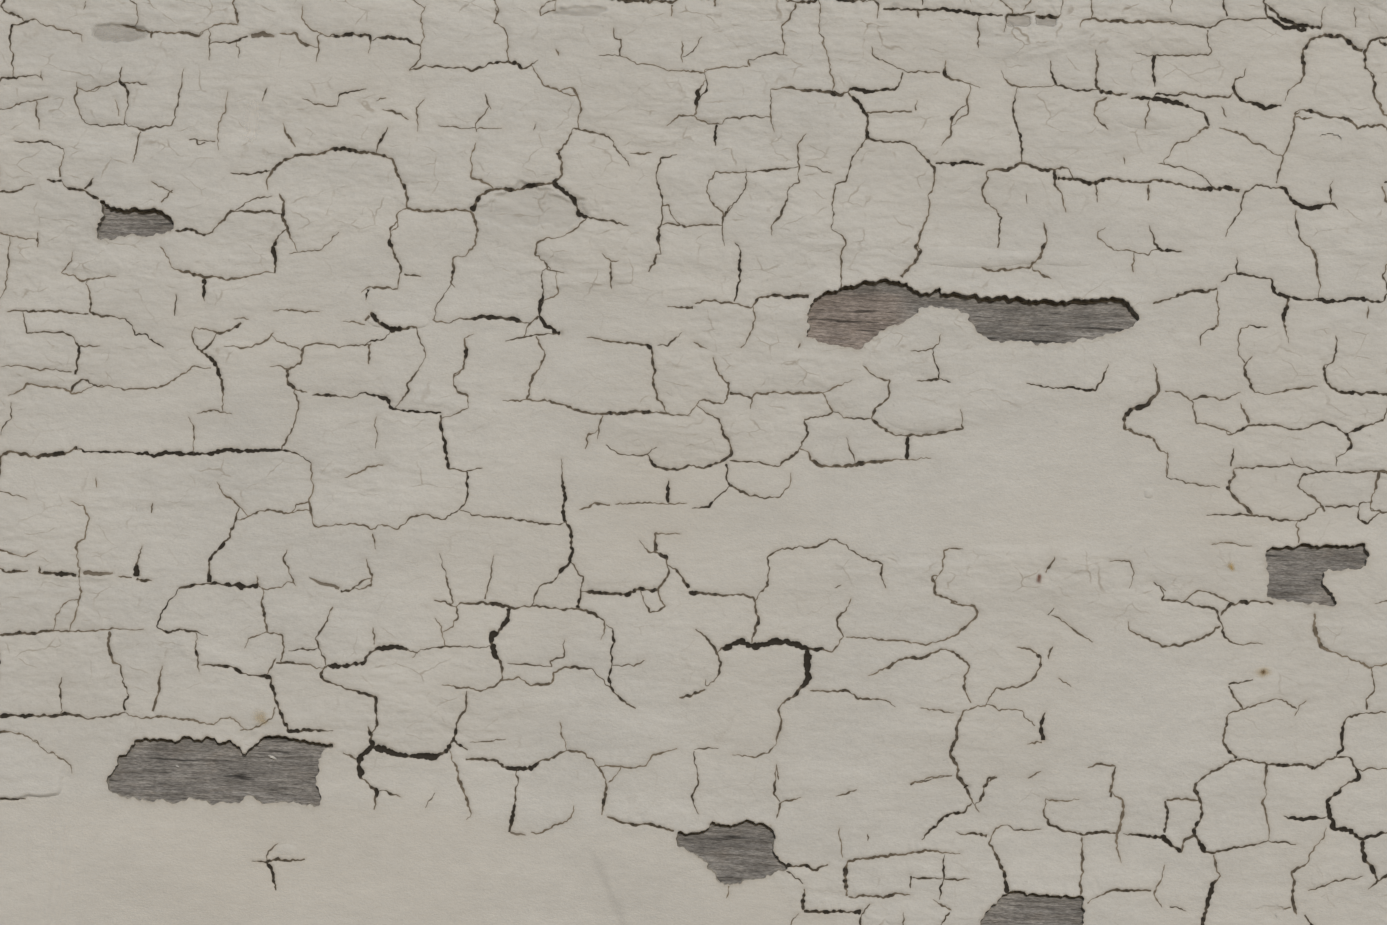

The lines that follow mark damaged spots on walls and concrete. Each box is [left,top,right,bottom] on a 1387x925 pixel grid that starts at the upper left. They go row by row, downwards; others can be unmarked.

crack [121,0,248,58]
crack [0,0,228,199]
peeling [97,200,174,240]
crack [0,232,39,298]
peeling [806,278,1139,350]
crack [1122,325,1387,543]
crack [1048,608,1092,642]
crack [1114,560,1273,648]
peeling [1265,543,1369,606]
peeling [106,735,333,807]
peeling [676,819,788,885]
peeling [980,891,1085,925]